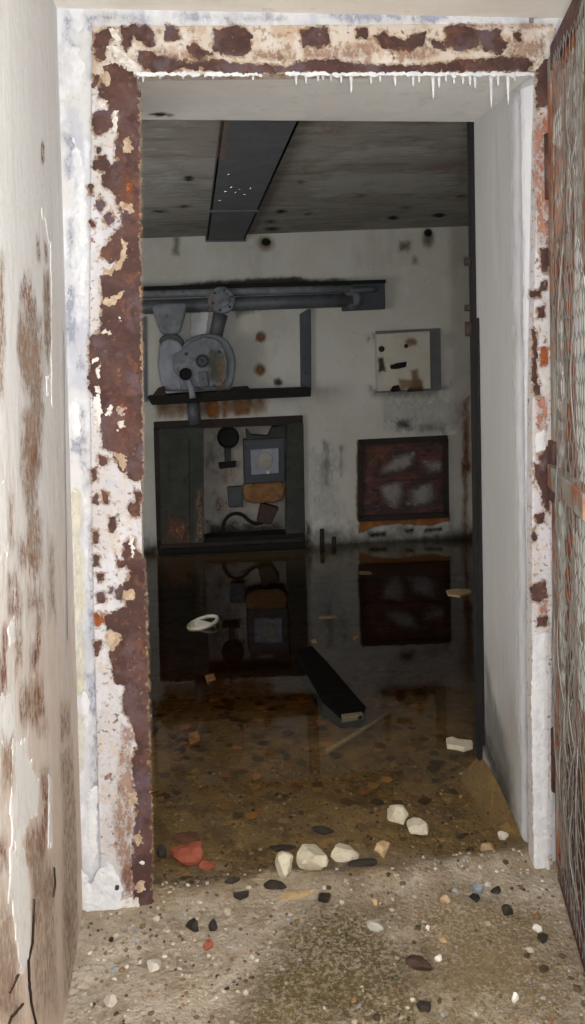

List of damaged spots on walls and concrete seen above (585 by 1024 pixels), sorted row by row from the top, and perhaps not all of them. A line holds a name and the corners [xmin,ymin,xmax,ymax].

efflorescence [68,14,86,81]
efflorescence [72,137,88,307]
efflorescence [71,401,81,439]
corrosion [86,22,576,908]
water stain [285,71,535,843]
water stain [72,493,82,621]
water stain [77,638,90,736]
crack [8,867,56,1024]
water stain [34,755,99,1010]
corrosion [566,739,585,921]